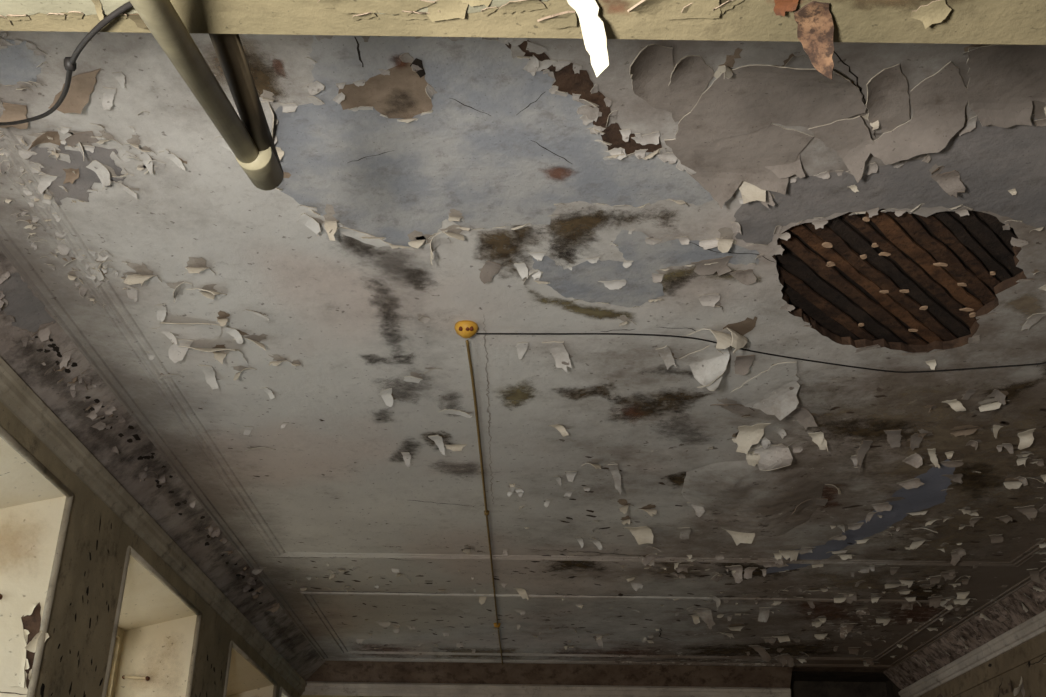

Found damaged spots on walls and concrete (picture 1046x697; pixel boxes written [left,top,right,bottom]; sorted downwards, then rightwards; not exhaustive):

peeling [0,0,148,49]
peeling [49,68,126,114]
damp [241,41,284,97]
peeling [259,0,1046,327]
damp [343,236,423,289]
damp [479,211,638,273]
damp [529,291,632,319]
peeling [21,321,141,454]
damp [502,385,535,407]
damp [559,385,710,442]
peeling [344,388,1046,670]
peeling [0,602,103,697]